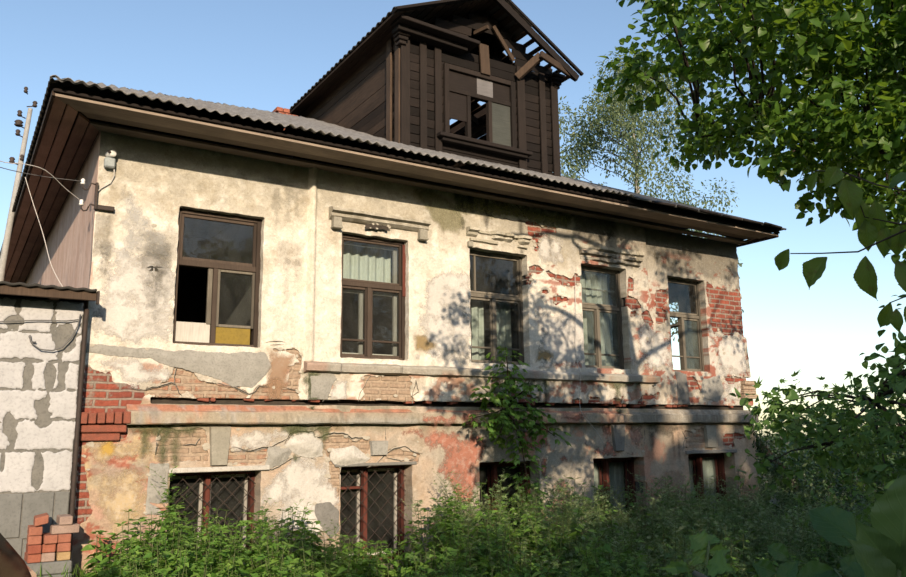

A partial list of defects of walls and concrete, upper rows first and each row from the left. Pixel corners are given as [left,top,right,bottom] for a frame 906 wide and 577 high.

peeling [89,203,175,350]
spalling [74,347,320,525]
peeling [227,428,370,541]
spalling [331,375,432,404]
peeling [385,402,486,502]
peeling [418,272,471,361]
peeling [525,219,585,368]
spalling [567,385,688,420]
peeling [625,277,673,369]
spalling [688,377,704,398]
spalling [706,282,746,408]